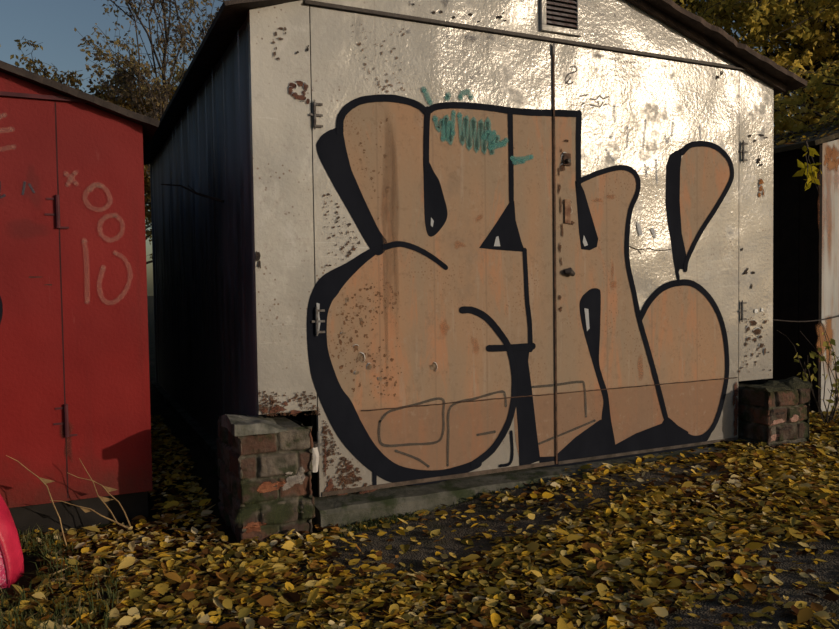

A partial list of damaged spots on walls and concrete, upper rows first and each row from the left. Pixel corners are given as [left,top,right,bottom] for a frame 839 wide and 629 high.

rust [824,146,839,170]
rust [323,193,360,266]
rust [258,390,377,497]